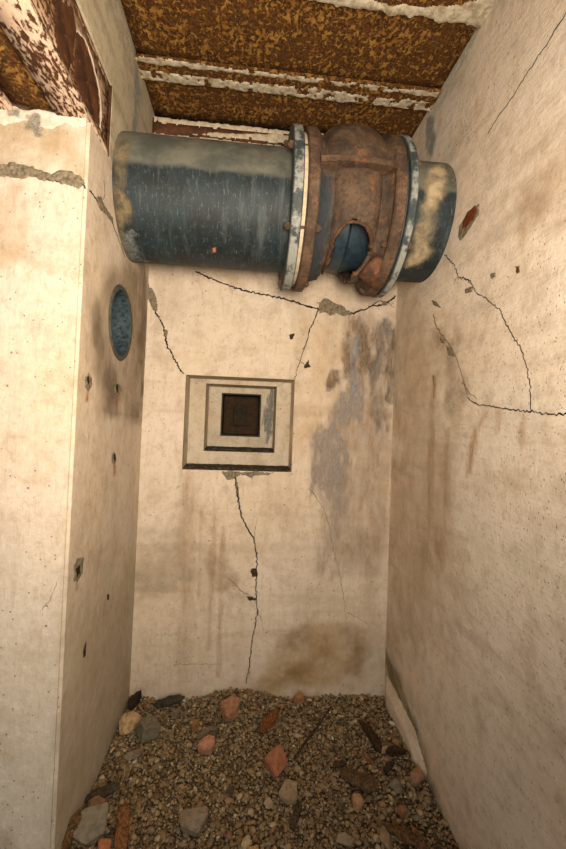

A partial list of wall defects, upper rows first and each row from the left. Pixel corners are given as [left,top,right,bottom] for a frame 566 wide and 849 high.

corrosion [54,0,100,125]
crack [488,13,566,133]
crack [153,309,184,374]
crack [195,271,319,386]
crack [349,295,396,315]
crack [433,254,566,416]
water stain [312,319,395,523]
crack [229,477,264,683]